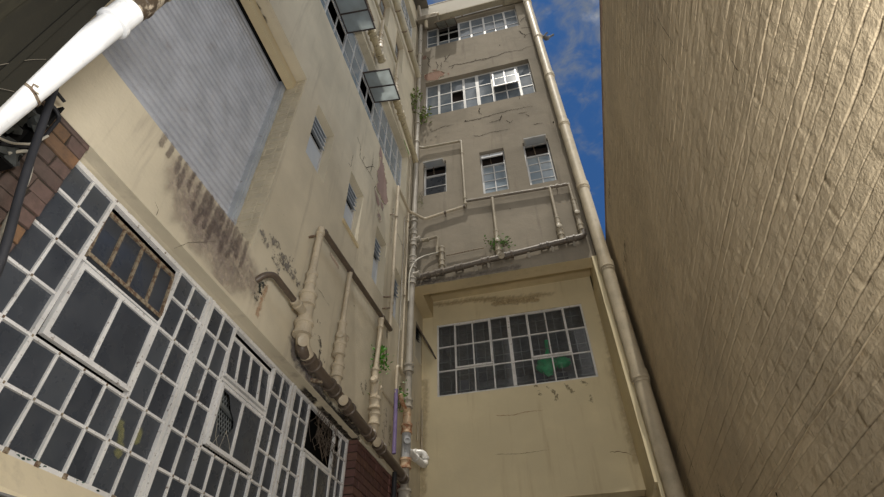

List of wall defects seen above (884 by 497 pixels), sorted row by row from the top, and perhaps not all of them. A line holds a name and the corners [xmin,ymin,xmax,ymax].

crack [431,97,540,137]
damp [171,174,266,301]